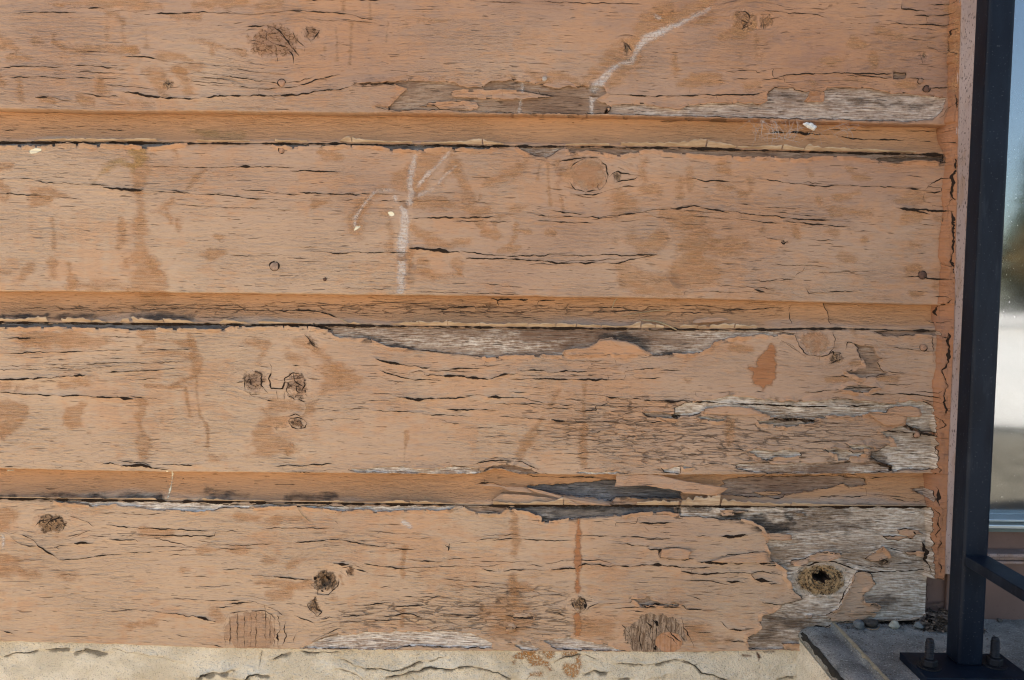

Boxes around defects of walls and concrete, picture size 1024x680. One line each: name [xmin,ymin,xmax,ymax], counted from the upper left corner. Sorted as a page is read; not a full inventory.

peeling [353,72,946,122]
peeling [0,316,796,362]
crack [328,2,958,614]
peeling [50,330,942,652]
crack [0,512,784,680]